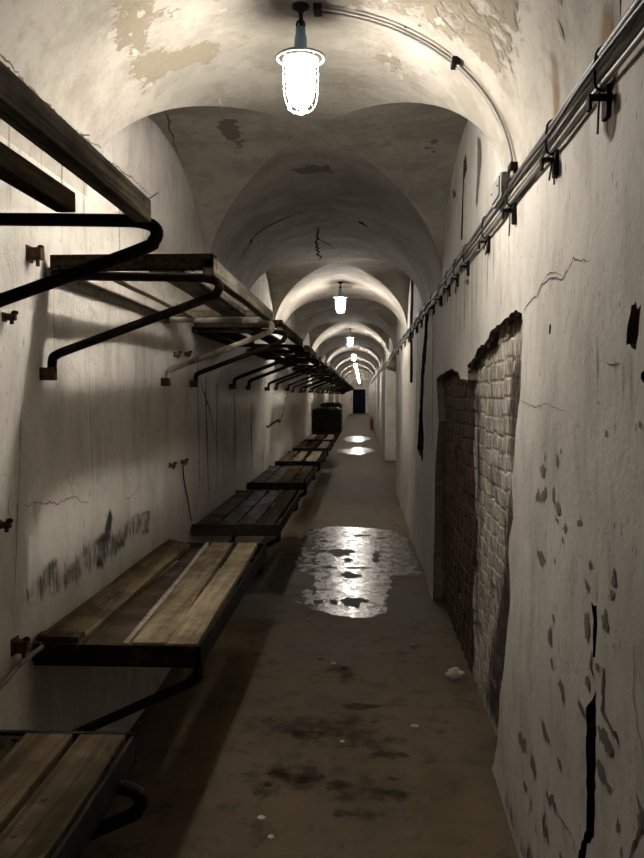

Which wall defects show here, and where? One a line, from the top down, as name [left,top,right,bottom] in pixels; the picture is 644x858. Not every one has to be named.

peeling [105,0,224,96]
peeling [348,0,523,81]
crack [0,54,151,195]
crack [524,257,591,309]
spalling [626,302,641,350]
flaking render [433,310,523,738]
peeling [536,449,566,544]
peeling [518,731,536,792]
crack [557,579,644,858]
peeling [596,725,613,793]